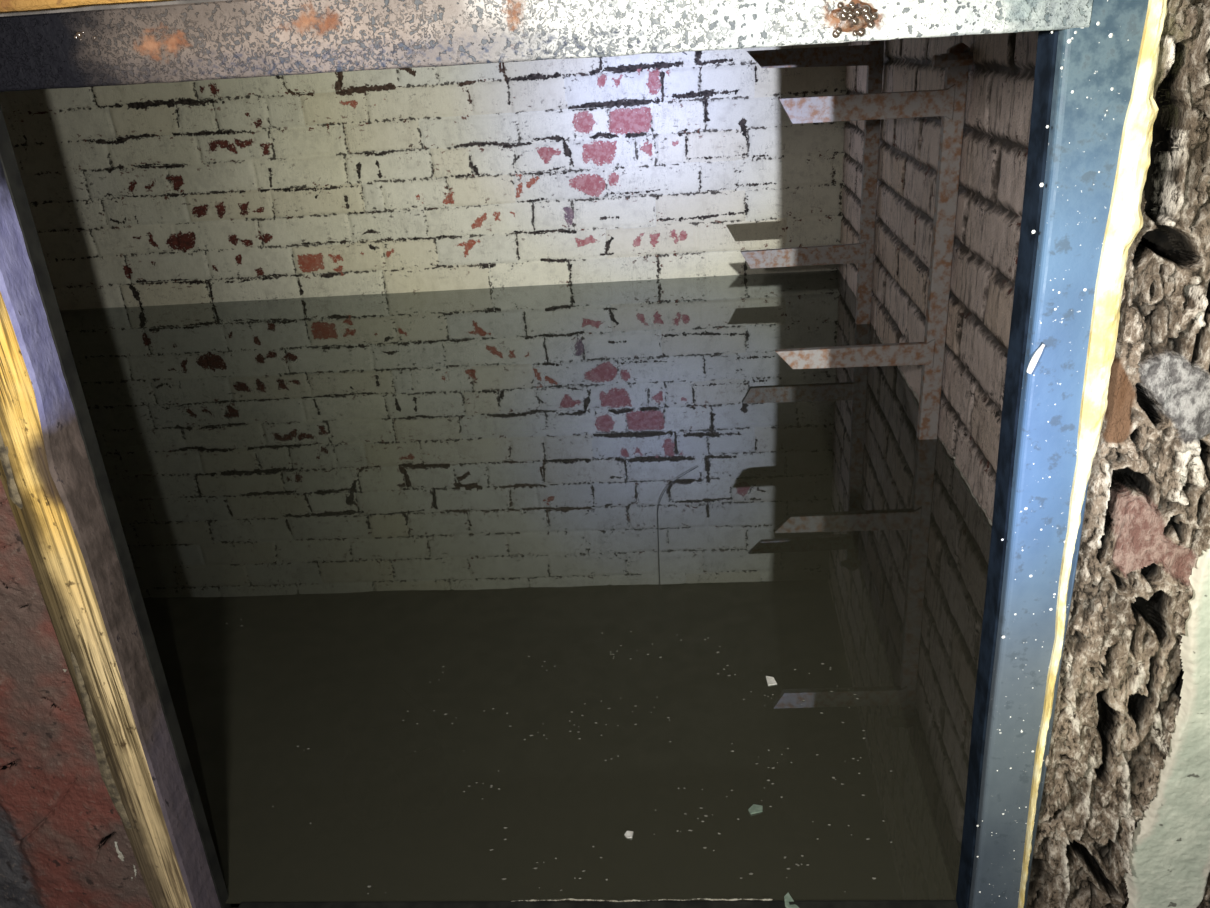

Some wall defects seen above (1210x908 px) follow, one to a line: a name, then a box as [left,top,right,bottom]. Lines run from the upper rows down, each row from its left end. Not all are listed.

corrosion [825,0,882,38]
peeling [208,113,272,156]
peeling [569,68,670,197]
peeling [124,175,184,195]
peeling [192,202,264,219]
peeling [133,231,196,266]
peeling [228,233,273,266]
peeling [297,253,344,276]
flaking render [1124,547,1210,908]